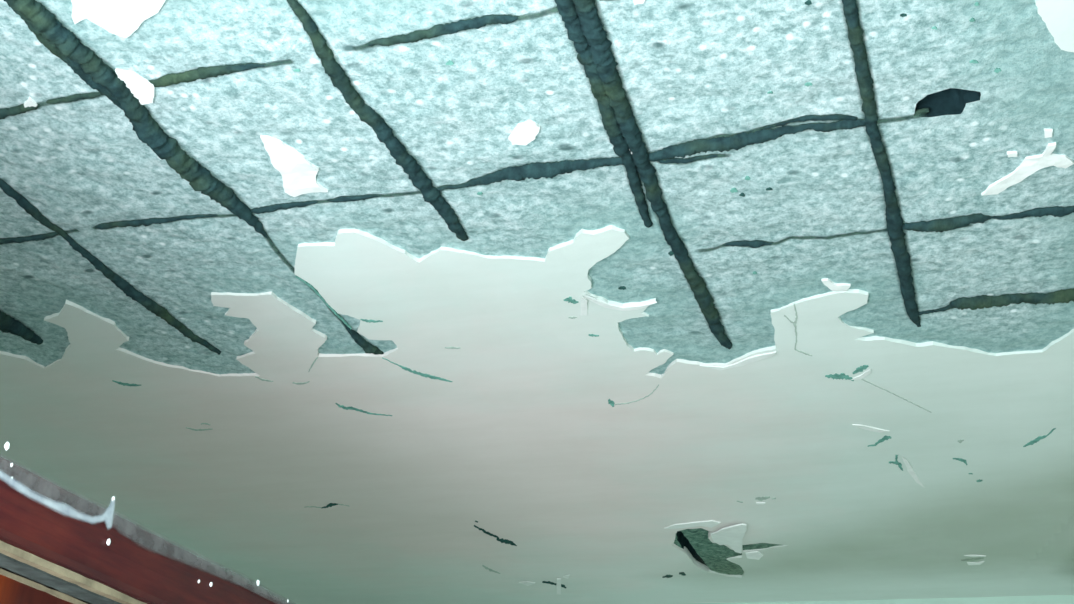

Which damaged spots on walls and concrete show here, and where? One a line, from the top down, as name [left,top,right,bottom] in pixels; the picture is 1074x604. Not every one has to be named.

spalling [0,0,1074,375]
crack [474,520,517,546]
spalling [664,520,780,575]